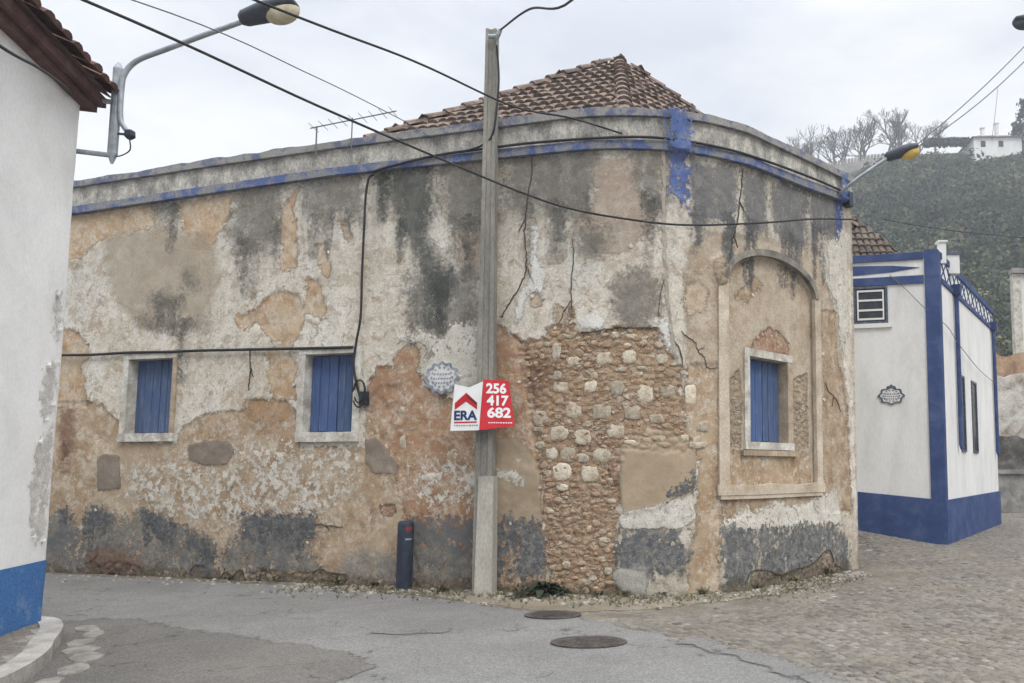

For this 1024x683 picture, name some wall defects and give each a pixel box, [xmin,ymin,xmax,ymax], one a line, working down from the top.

peeling [274,186,301,272]
leakage [375,164,482,357]
crack [501,156,533,317]
crack [558,151,712,369]
peeling [662,102,697,209]
crack [729,169,744,260]
leakage [688,157,837,303]
crack [247,347,255,391]
peeling [29,240,476,588]
flaking render [496,234,854,595]
leakage [46,521,396,587]
leakage [719,553,851,592]